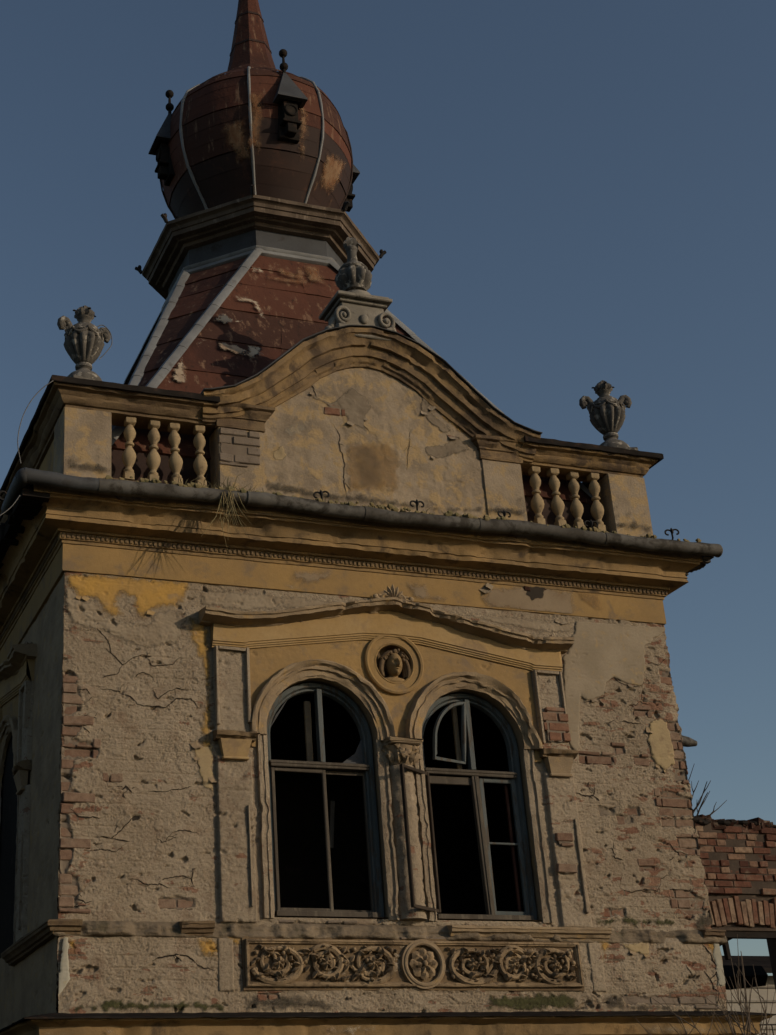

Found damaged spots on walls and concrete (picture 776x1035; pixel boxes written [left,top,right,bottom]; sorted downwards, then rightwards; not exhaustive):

peeling [220,343,260,357]
crack [312,386,350,497]
flaking render [57,675,101,913]
crack [66,611,202,733]
crack [70,761,203,852]
peeling [66,575,209,685]
peeling [190,706,218,791]
peeling [479,583,693,817]
crack [130,868,199,888]
crack [151,947,215,970]